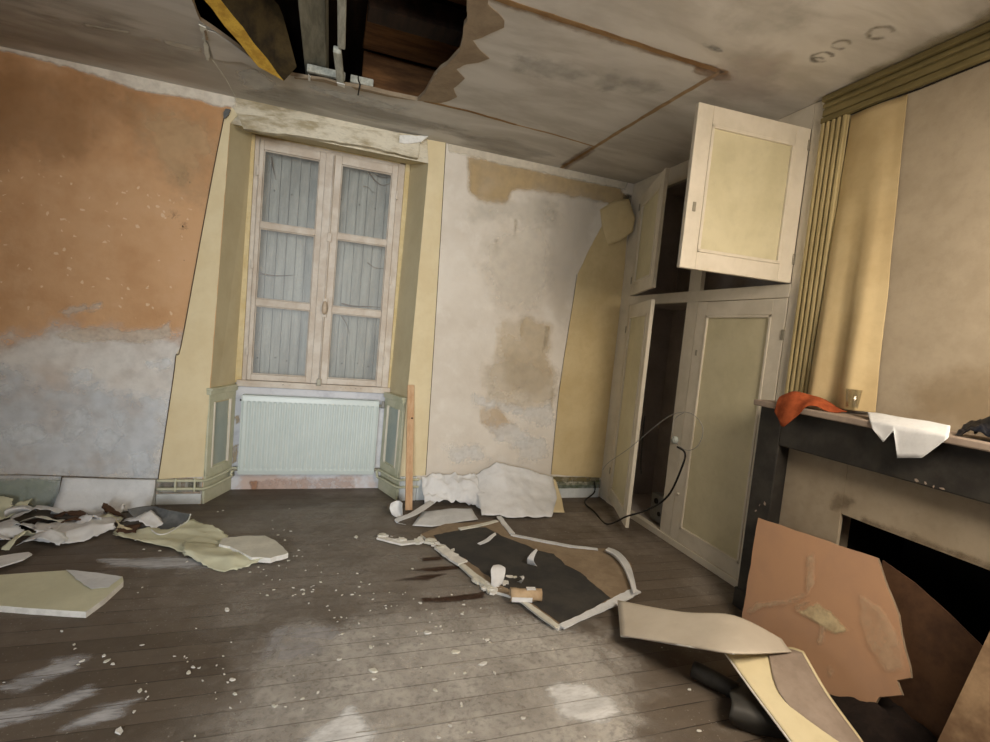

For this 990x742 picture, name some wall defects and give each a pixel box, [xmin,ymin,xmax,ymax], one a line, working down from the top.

peeling [294,74,416,101]
peeling [448,144,627,189]
damp [0,393,163,478]